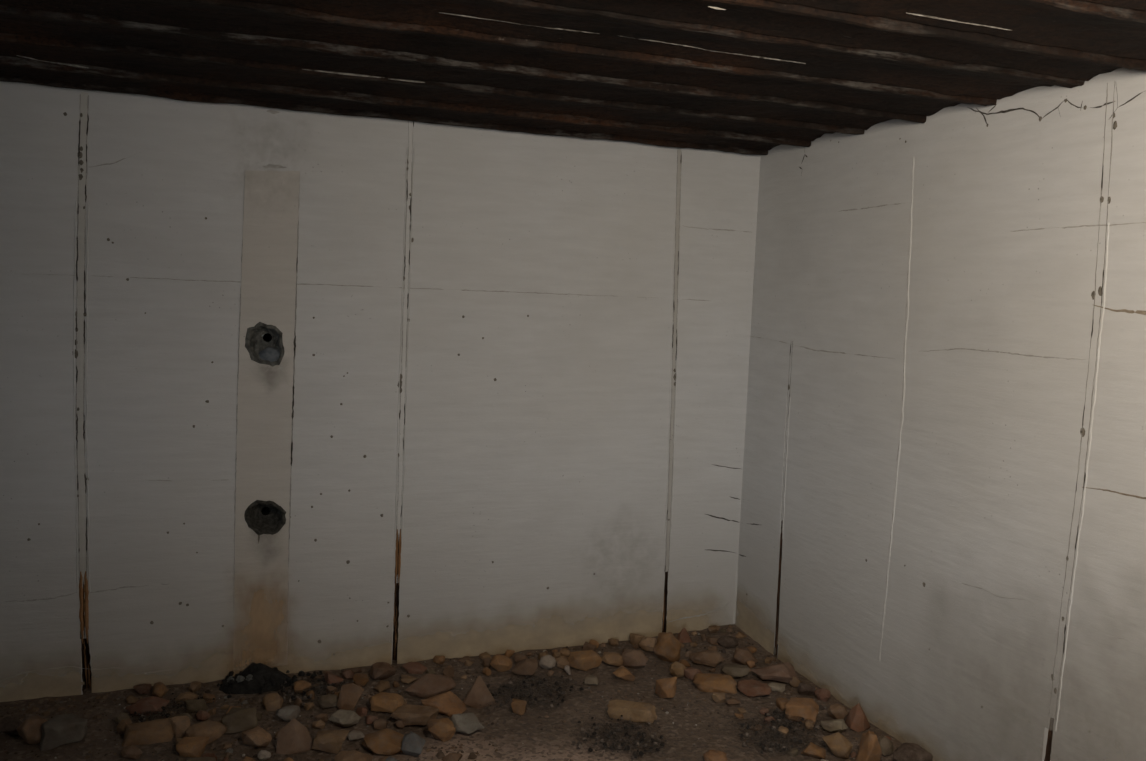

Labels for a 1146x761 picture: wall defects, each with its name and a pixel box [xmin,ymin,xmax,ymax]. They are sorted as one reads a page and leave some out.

crack [706,83,1146,761]